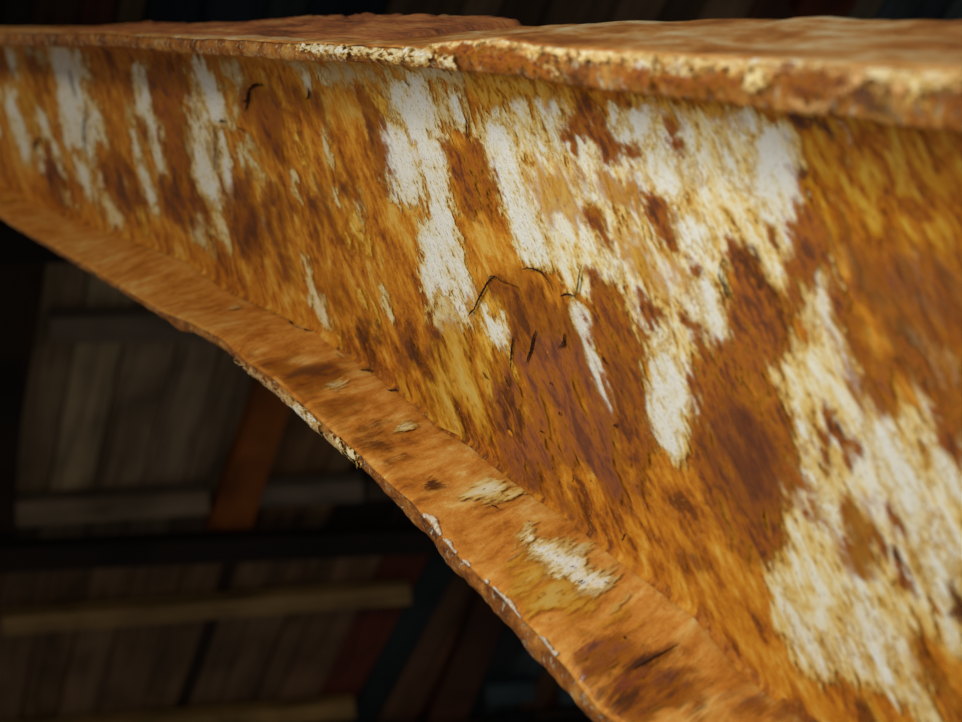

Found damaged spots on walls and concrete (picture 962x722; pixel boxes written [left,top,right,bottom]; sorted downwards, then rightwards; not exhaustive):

rust [40,154,64,209]
peeling [0,45,271,260]
rust [91,54,208,236]
rust [218,74,341,288]
rust [328,159,366,219]
rust [354,40,962,599]
rust [244,351,348,395]
peeling [282,39,962,722]
rust [317,394,408,462]
rust [946,579,962,623]
rust [571,628,710,722]